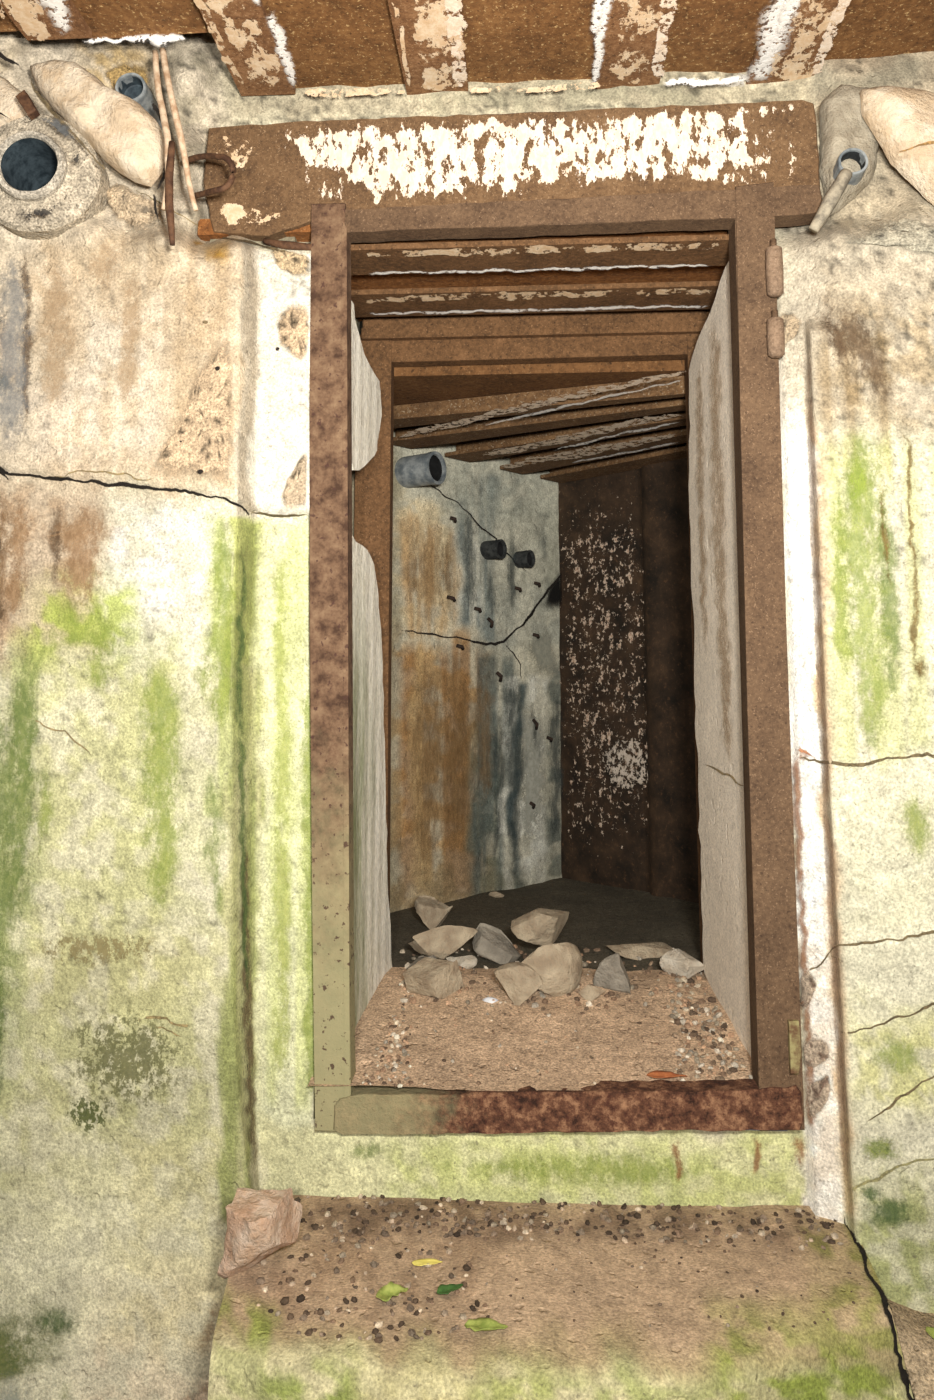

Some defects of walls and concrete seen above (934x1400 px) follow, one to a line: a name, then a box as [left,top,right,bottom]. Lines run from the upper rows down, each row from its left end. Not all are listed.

peeling [392,0,468,91]
peeling [609,0,677,84]
peeling [769,0,851,82]
peeling [285,104,794,204]
crack [0,467,307,518]
leakage [833,458,866,657]
leakage [880,522,899,689]
leakage [144,676,176,894]
crack [799,749,934,767]
leakage [237,570,257,1157]
crack [810,930,934,970]
crack [844,1158,934,1400]